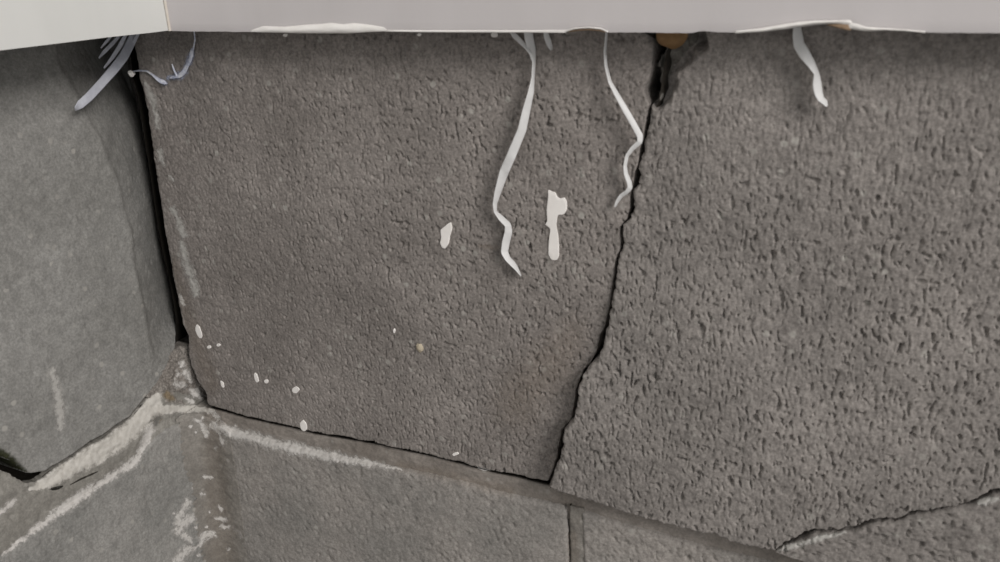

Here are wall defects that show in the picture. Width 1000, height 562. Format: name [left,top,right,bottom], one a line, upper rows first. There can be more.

crack [657,48,672,107]
spalling [650,31,699,103]
peeling [545,190,567,260]
efflorescence [50,368,65,431]
efflorescence [188,409,403,471]
crack [211,406,551,488]
damp [0,424,155,556]
efflorescence [172,487,230,562]